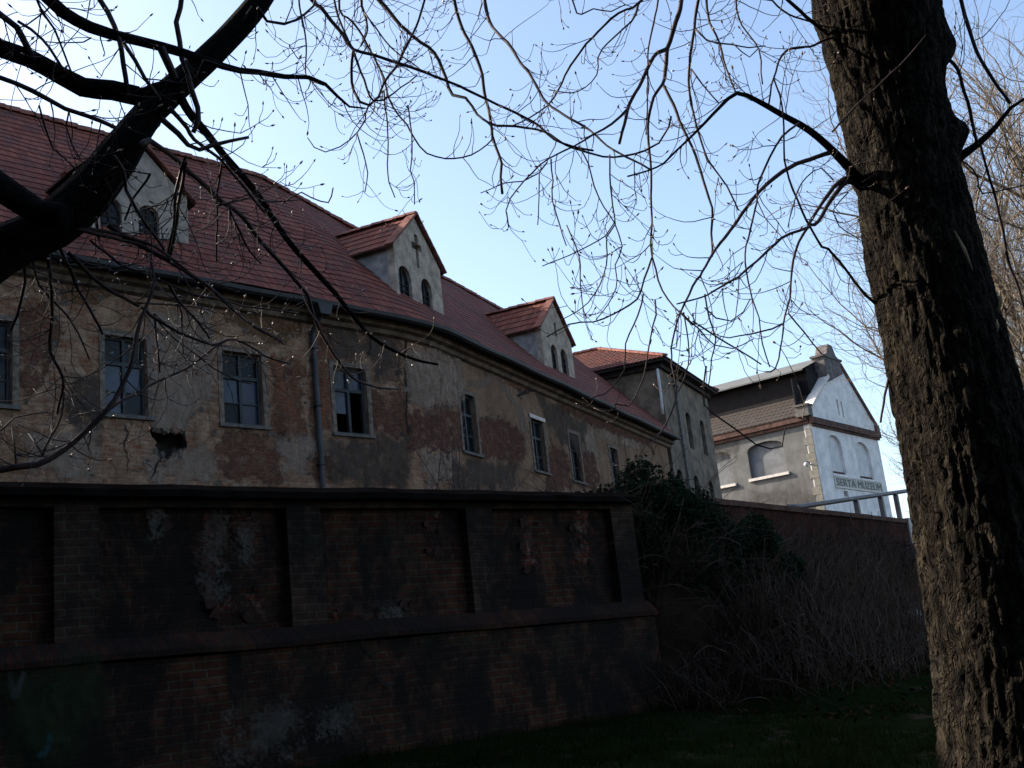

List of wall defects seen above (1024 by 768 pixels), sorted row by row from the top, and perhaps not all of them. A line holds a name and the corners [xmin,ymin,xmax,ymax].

spalling [146,426,189,462]